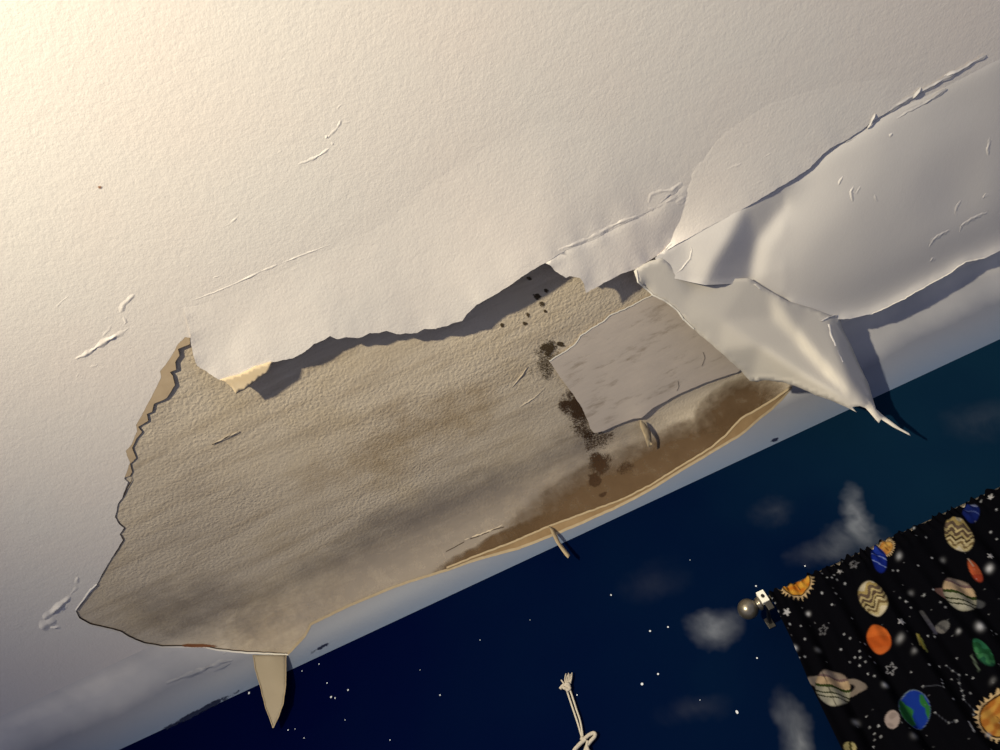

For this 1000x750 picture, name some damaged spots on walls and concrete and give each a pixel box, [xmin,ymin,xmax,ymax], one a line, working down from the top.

peeling [76,263,793,656]
damp [297,382,777,627]